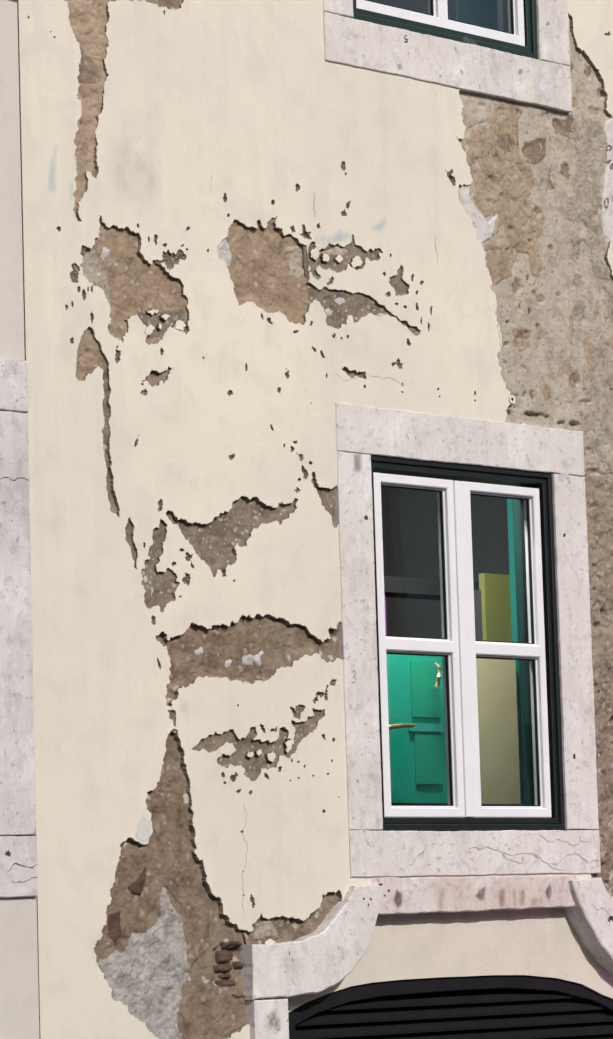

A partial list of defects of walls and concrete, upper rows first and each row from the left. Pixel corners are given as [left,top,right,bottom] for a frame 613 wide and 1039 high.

flaking render [64,0,115,221]
flaking render [129,0,182,14]
flaking render [65,218,187,514]
flaking render [207,193,432,346]
flaking render [447,17,613,896]
flaking render [94,441,341,1039]